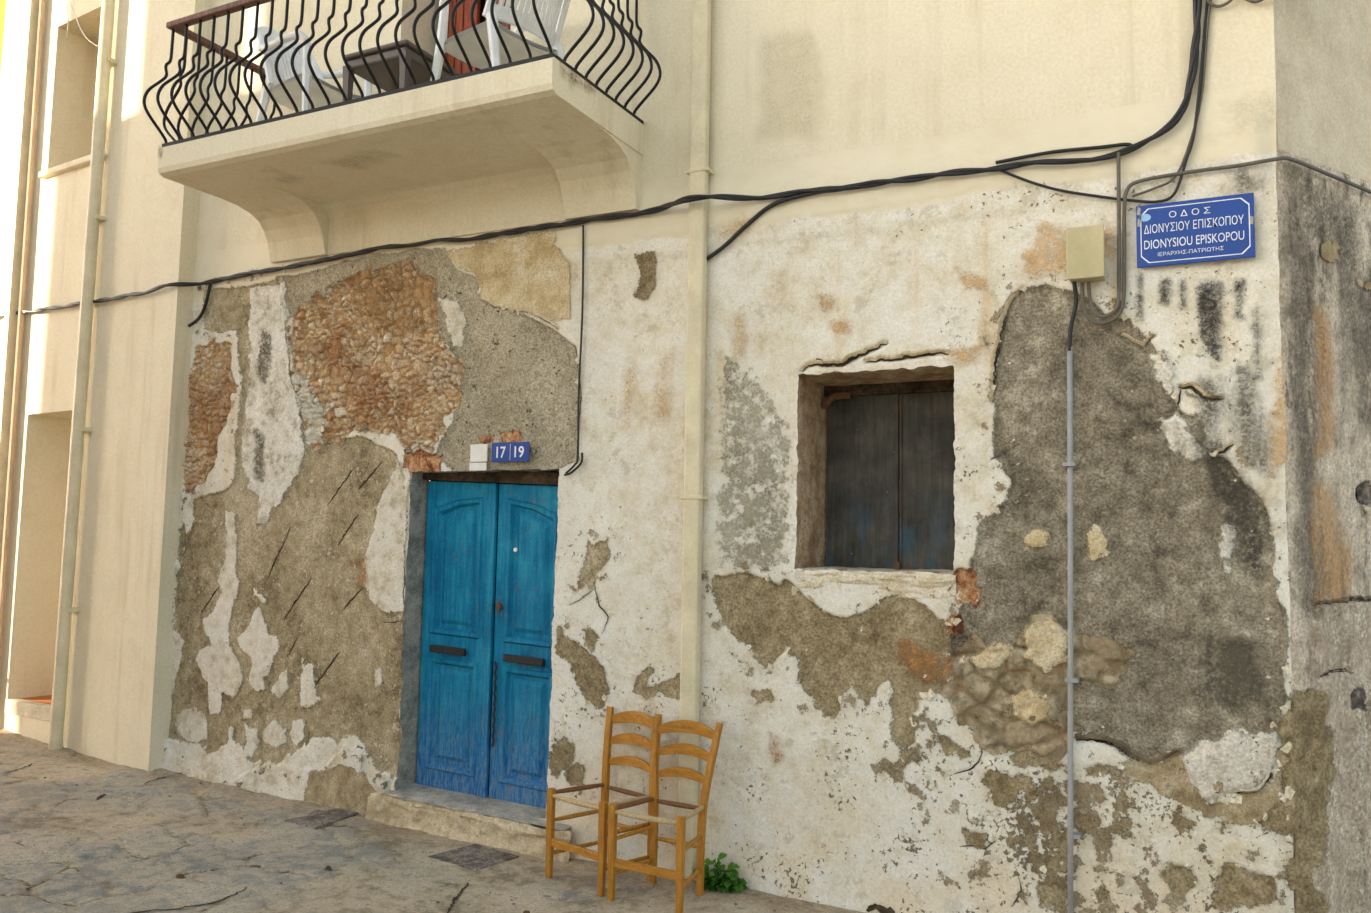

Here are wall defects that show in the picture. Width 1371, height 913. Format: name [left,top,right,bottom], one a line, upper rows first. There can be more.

peeling [633,251,657,300]
crack [799,339,949,371]
water stain [1149,353,1174,394]
water stain [1155,278,1269,575]
water stain [1294,270,1323,610]
spalling [160,230,586,815]
spalling [702,265,1337,913]
crack [1314,595,1371,606]
crack [1319,668,1354,677]